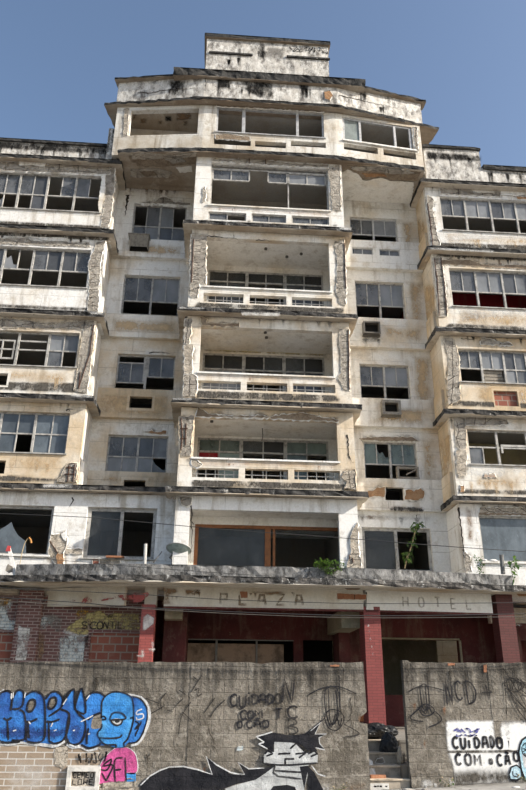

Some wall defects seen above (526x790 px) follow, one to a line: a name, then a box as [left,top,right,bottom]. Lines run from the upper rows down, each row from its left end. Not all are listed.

leakage [168,81,186,95]
leakage [241,81,272,97]
flaking render [368,486,386,498]
flaking render [403,487,425,502]